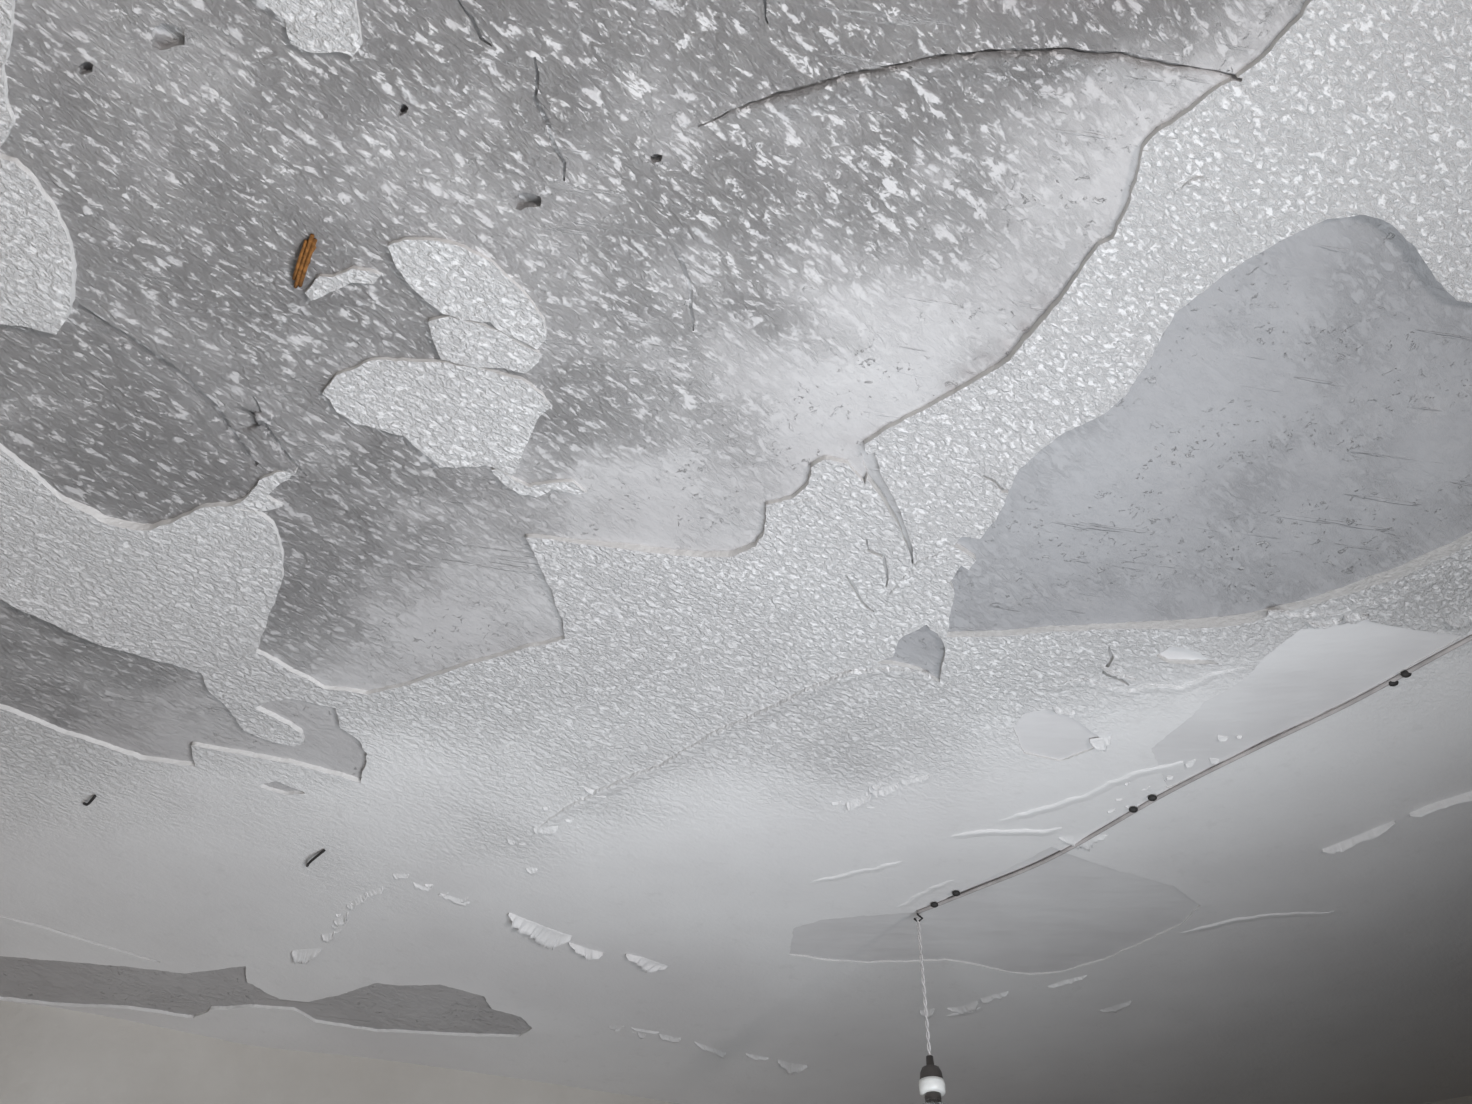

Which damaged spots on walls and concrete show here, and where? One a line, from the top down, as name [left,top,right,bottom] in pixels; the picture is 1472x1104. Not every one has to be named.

crack [457,0,493,47]
crack [532,57,566,181]
corrosion [292,234,317,289]
crack [671,246,694,331]
peeling [0,0,1311,783]
peeling [789,215,1472,988]
peeling [259,781,305,795]
peeling [0,956,532,1037]
peeling [508,912,603,961]
peeling [625,954,669,973]